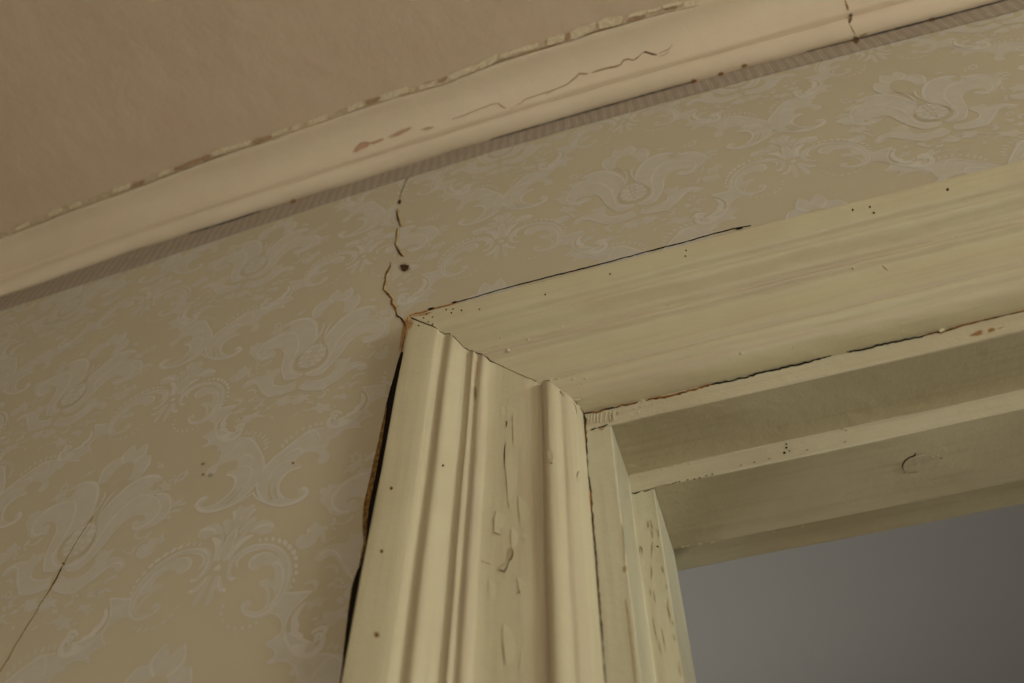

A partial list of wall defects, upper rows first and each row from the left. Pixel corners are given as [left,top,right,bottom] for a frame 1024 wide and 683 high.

peeling [0,0,707,239]
crack [454,45,672,119]
crack [383,178,751,382]
crack [583,310,1024,683]